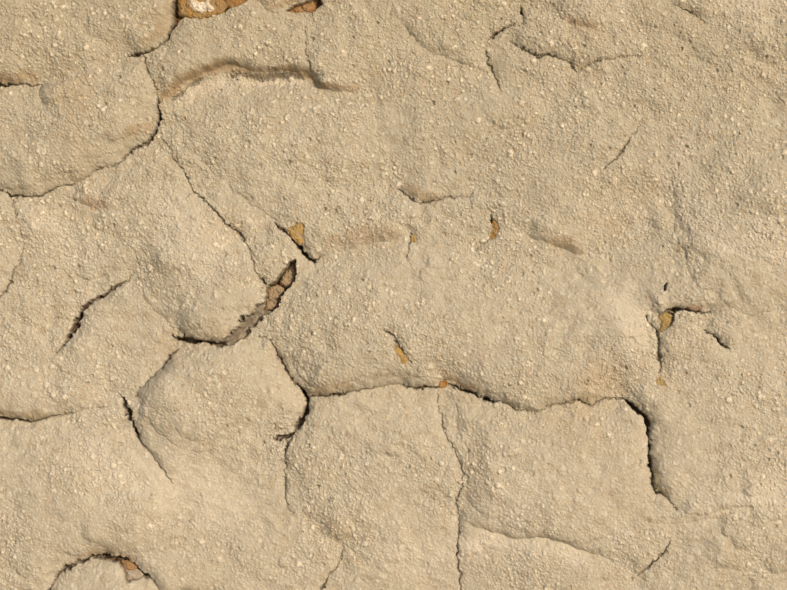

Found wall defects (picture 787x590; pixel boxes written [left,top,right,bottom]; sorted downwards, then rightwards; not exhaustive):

spalling [172,0,248,27]
crack [485,7,648,93]
crack [0,0,267,297]
crack [602,119,641,170]
crack [397,189,472,205]
spalling [287,222,305,245]
crack [273,222,321,264]
spalling [263,259,297,312]
crack [55,272,135,354]
spalling [658,311,675,334]
crack [644,306,731,376]
crack [0,301,677,590]